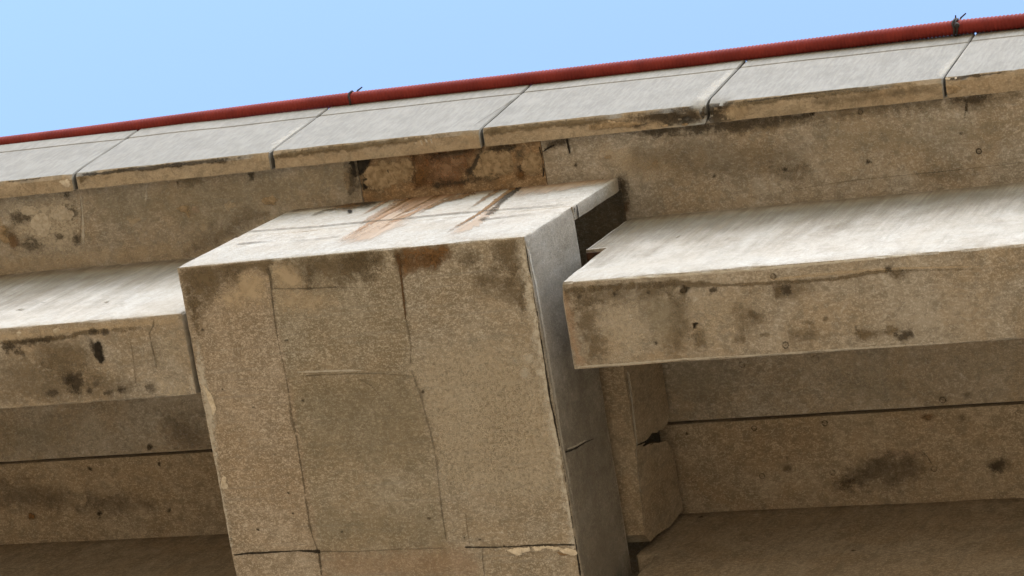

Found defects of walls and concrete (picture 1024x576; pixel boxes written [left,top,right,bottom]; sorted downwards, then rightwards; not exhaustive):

corrosion [345,149,516,241]
damp [1,329,131,363]
damp [48,373,126,396]
crack [465,246,593,576]
spalling [507,245,577,556]
crack [234,549,322,575]